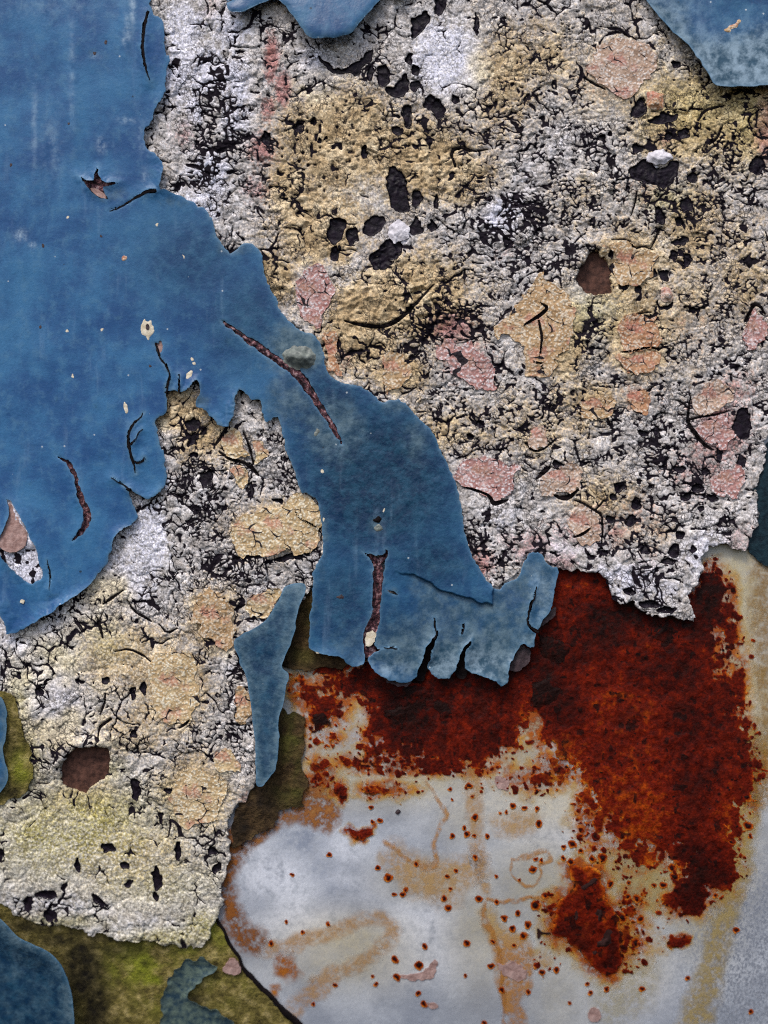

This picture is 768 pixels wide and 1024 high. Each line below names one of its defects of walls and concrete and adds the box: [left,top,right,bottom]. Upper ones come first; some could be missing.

crack [344,284,434,329]
peeling [144,0,768,621]
crack [524,304,548,372]
crack [58,457,91,541]
crack [215,427,259,475]
peeling [0,0,559,949]
crack [463,487,508,506]
crack [526,442,604,544]
crack [675,395,729,451]
crack [97,590,178,662]
crack [363,550,398,658]
corrosion [221,555,768,996]